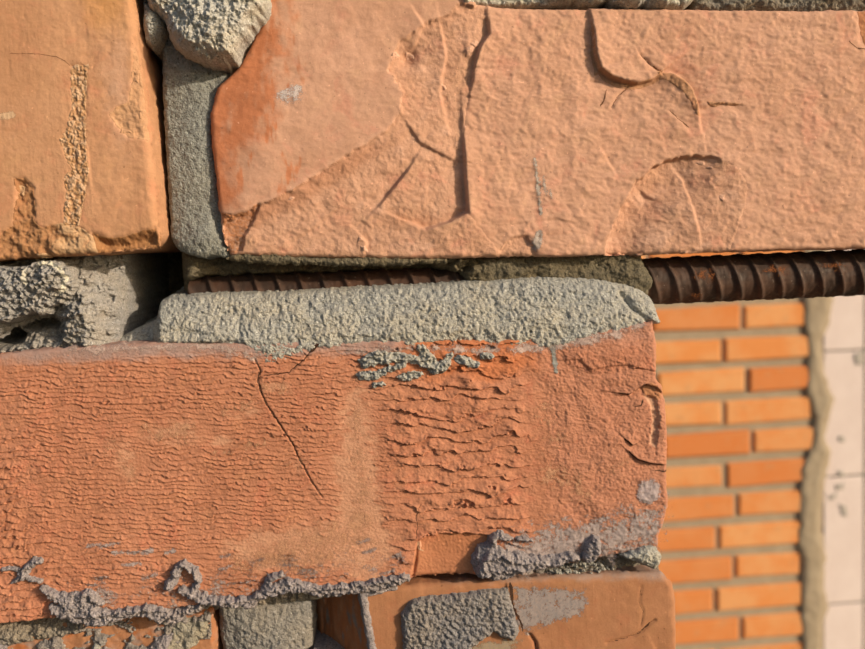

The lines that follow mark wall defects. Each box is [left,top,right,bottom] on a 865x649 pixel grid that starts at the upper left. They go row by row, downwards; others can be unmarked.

spalling [0,64,163,260]
spalling [109,48,152,142]
spalling [222,2,537,259]
spalling [605,155,748,256]
crack [255,343,322,496]
crack [509,582,536,647]